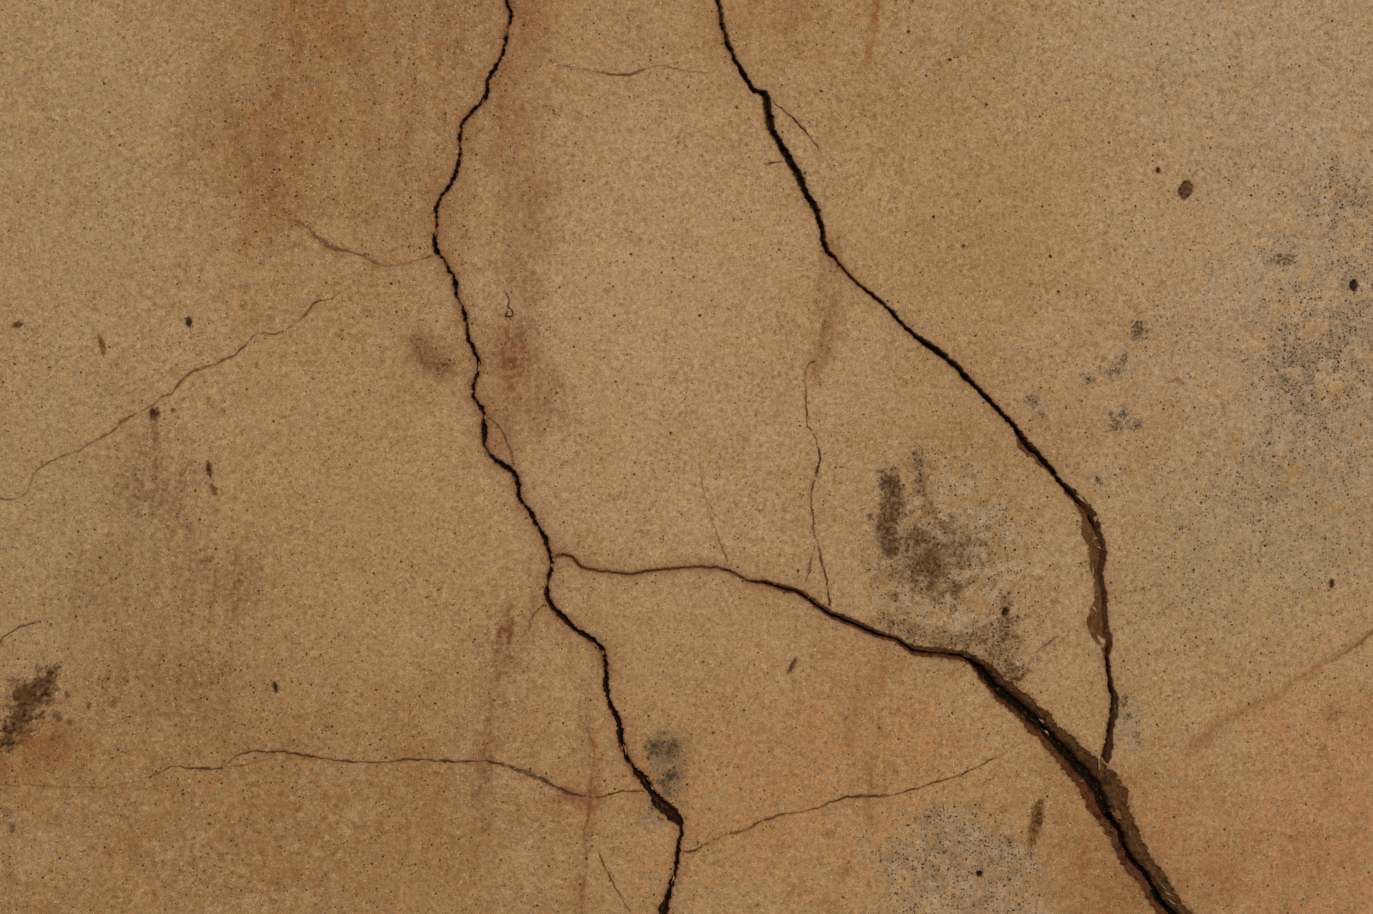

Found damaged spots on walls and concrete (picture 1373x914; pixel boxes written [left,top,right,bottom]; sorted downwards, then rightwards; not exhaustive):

crack [0,275,361,502]
crack [291,0,1199,914]
crack [0,616,54,649]
water stain [0,390,333,914]
crack [0,710,647,914]